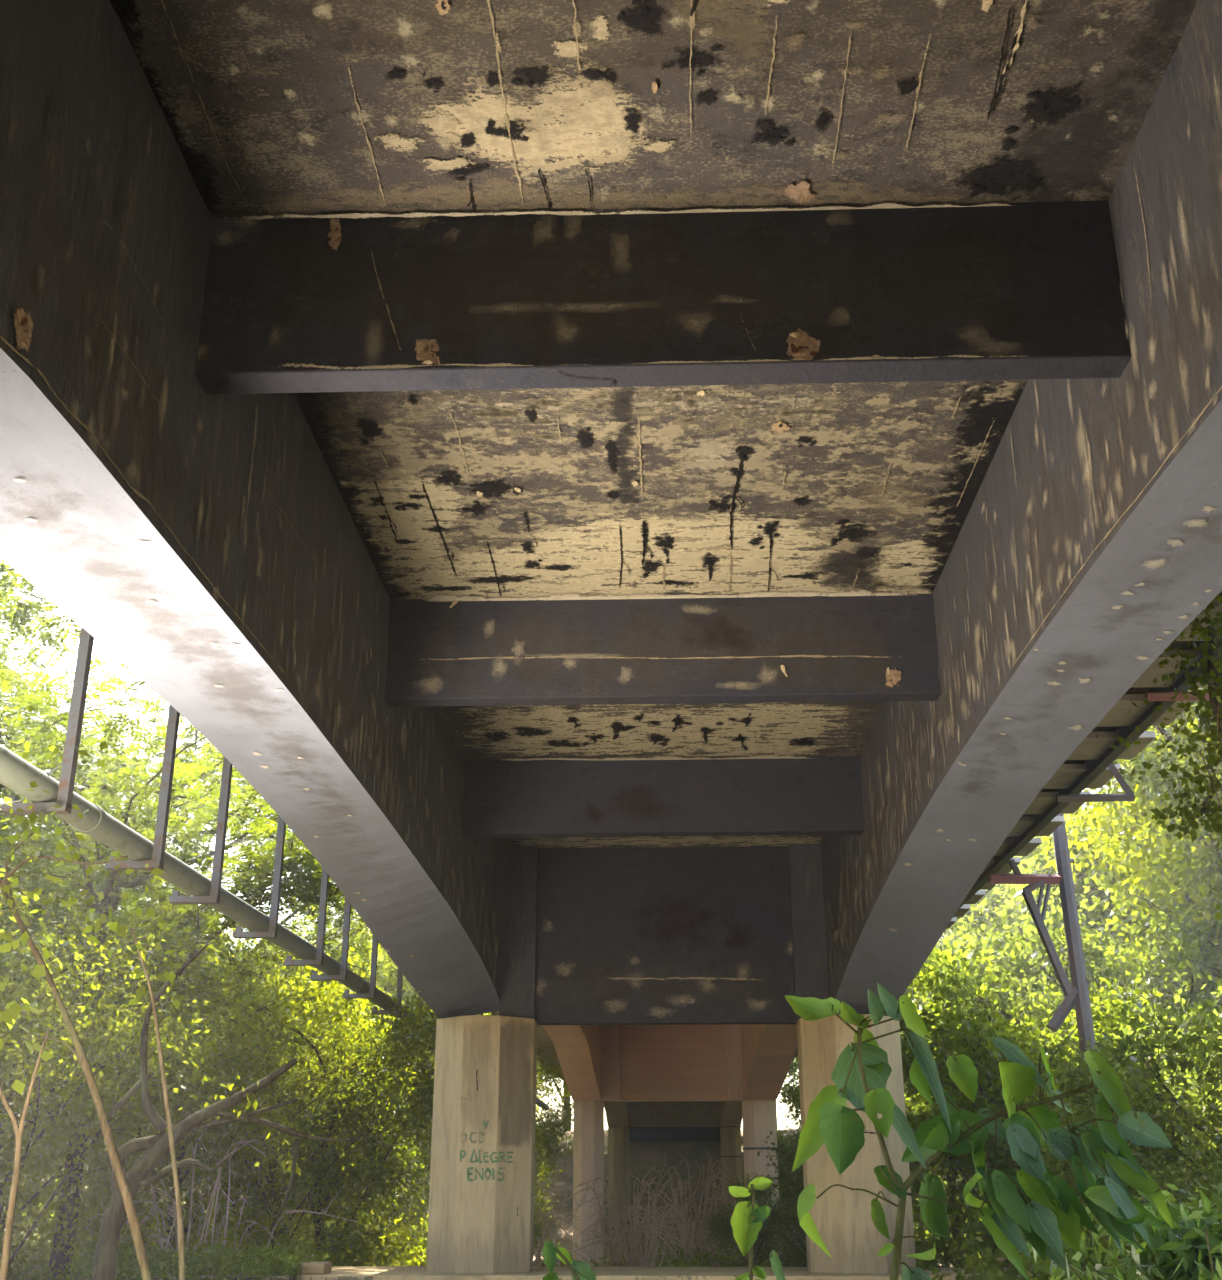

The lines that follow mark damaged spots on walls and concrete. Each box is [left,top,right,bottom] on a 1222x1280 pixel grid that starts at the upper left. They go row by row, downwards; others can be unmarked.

crack [987,9,1017,121]
leakage [161,0,1011,245]
spalling [13,308,34,353]
spalling [414,339,440,365]
leakage [558,303,654,341]
spalling [786,328,821,361]
leakage [808,326,1022,361]
leakage [422,508,915,613]
leakage [542,654,608,666]
leakage [762,665,788,681]
spalling [885,668,901,687]
leakage [502,713,805,761]